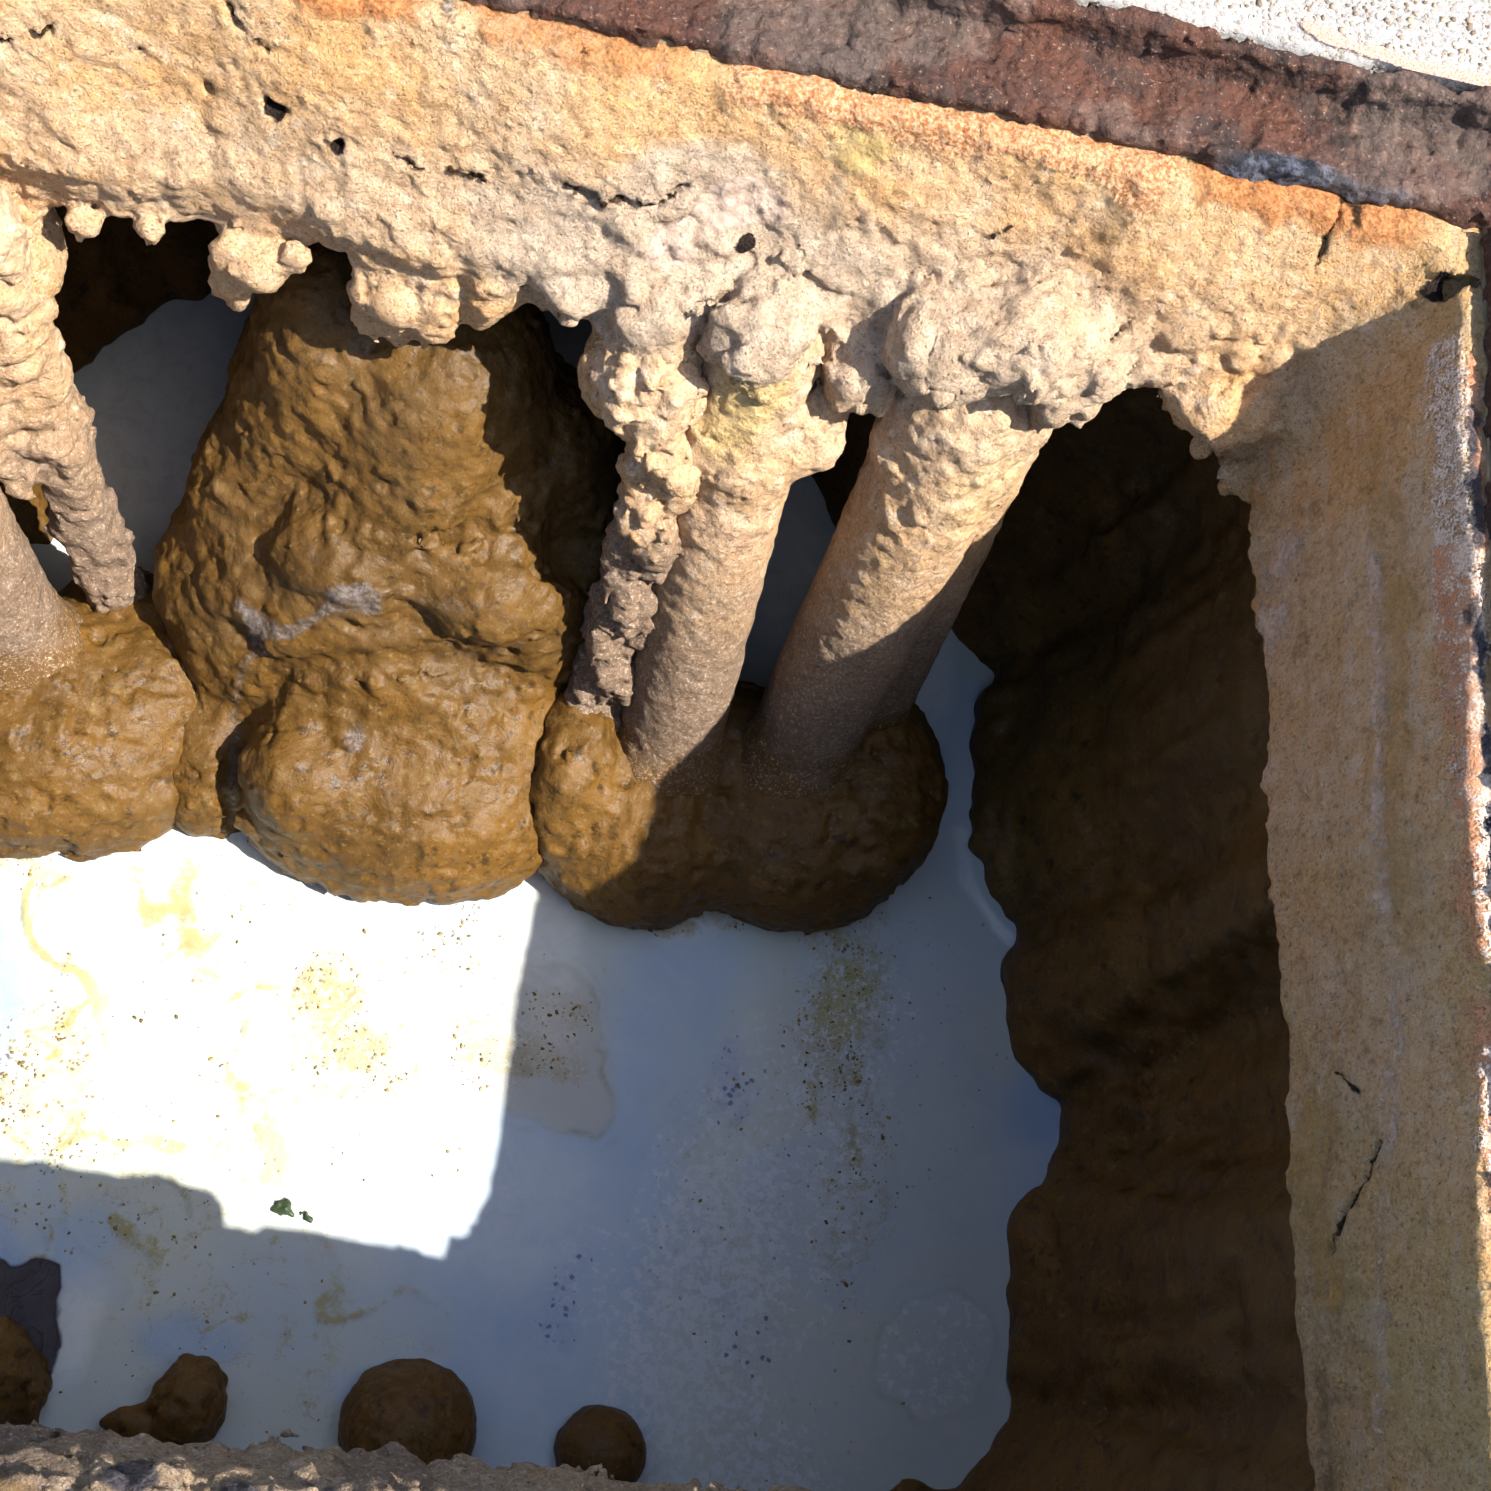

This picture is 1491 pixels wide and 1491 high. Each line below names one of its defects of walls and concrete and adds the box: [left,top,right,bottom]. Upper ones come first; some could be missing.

crack [0,24,53,42]
rust [723,65,1428,247]
crack [1318,198,1362,266]
crack [1335,1072,1360,1094]
crack [1332,1139,1382,1255]